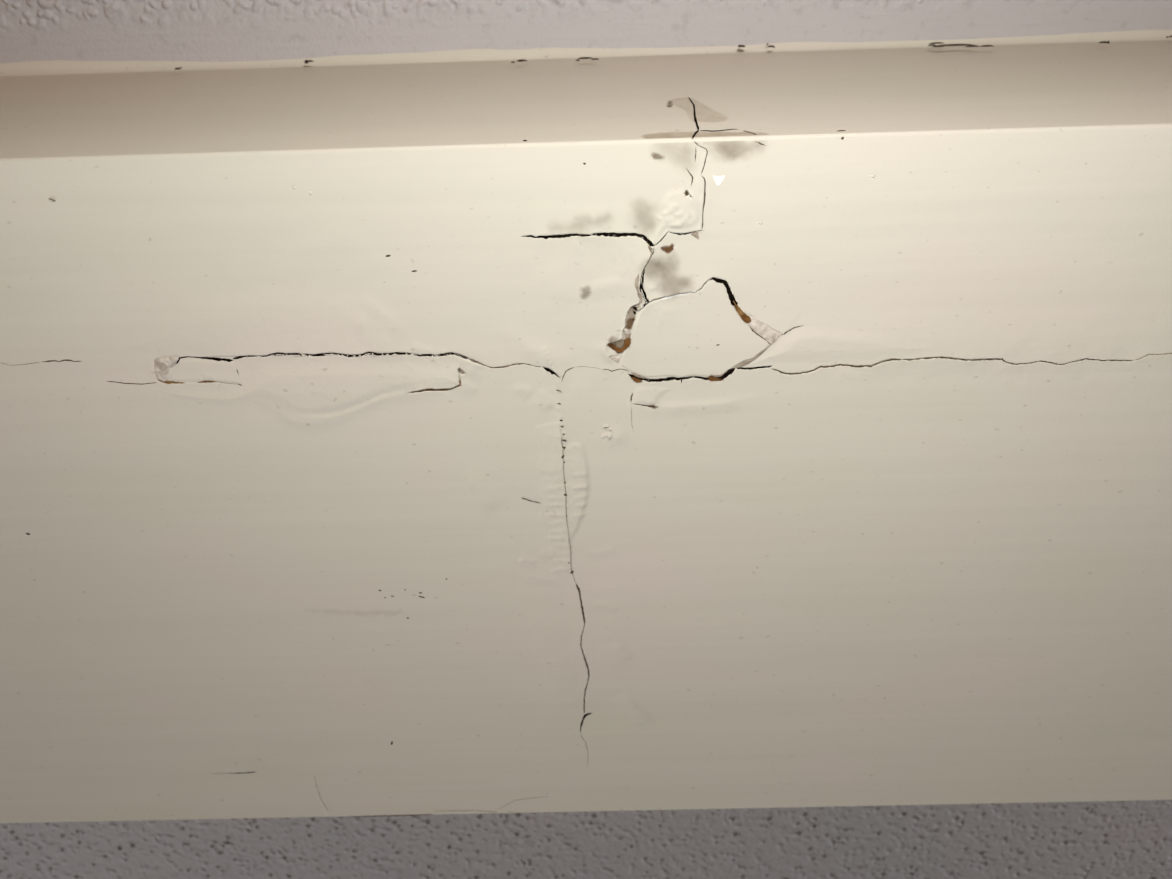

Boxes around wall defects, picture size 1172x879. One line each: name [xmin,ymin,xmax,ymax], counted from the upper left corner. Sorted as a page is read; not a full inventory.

crack [218,98,1172,766]
peeling [622,224,819,378]